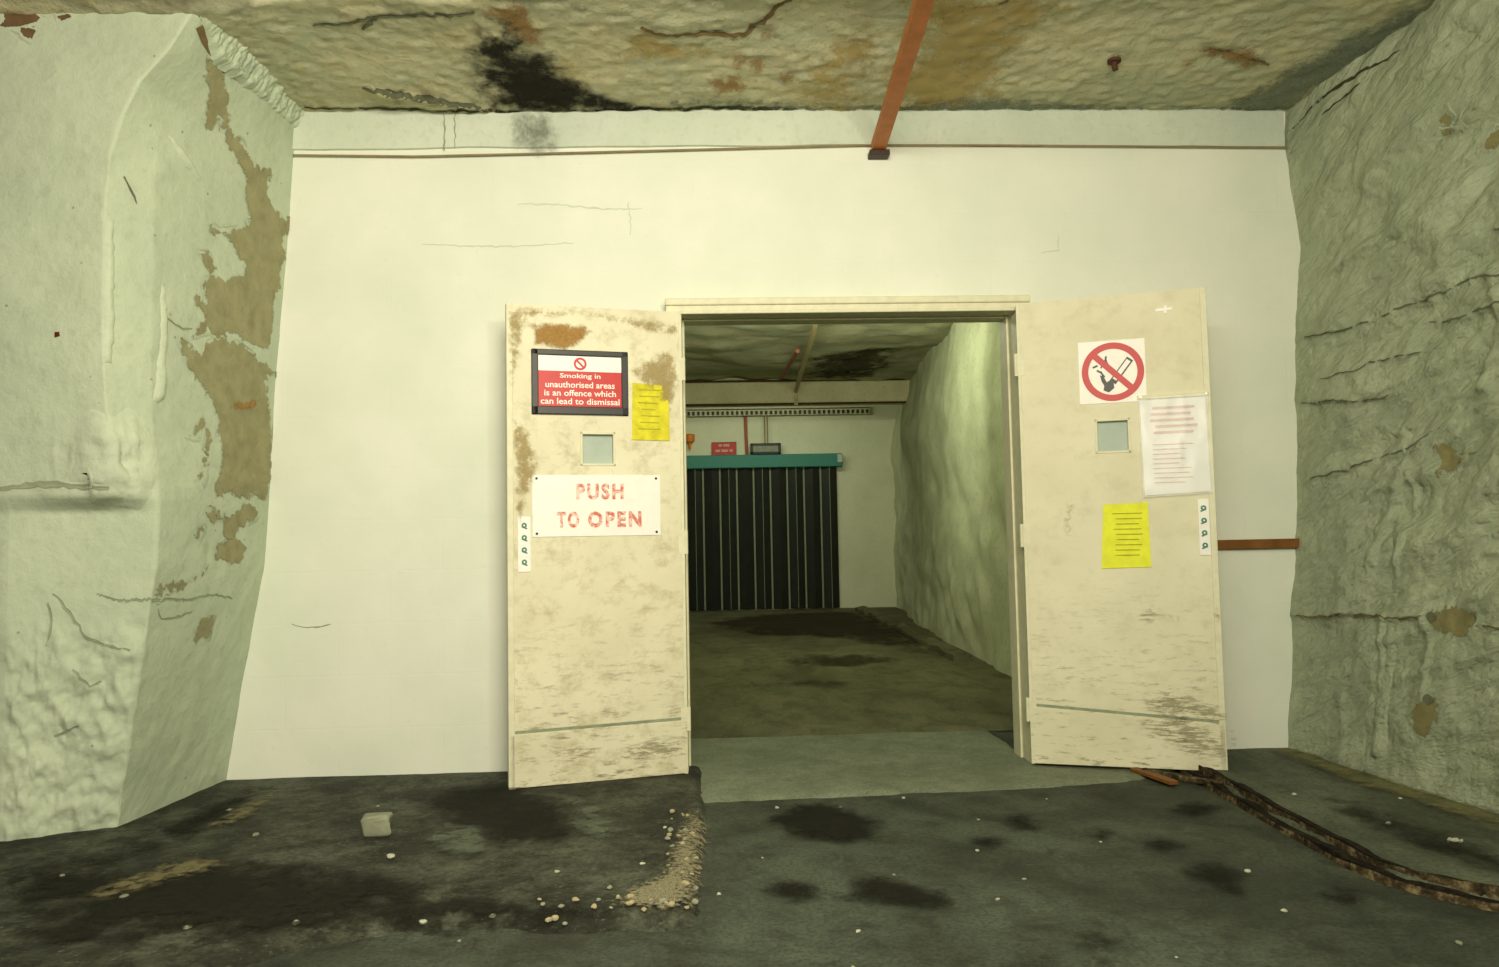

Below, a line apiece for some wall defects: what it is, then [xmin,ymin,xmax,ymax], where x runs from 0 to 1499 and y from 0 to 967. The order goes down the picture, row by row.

crack [640,0,792,38]
crack [1292,49,1401,129]
peeling [155,55,290,605]
crack [1301,273,1499,405]
crack [1310,427,1440,479]
peeling [1433,443,1480,480]
peeling [194,614,216,643]
peeling [1426,604,1475,644]
peeling [1411,694,1439,741]
damp [431,785,572,852]
damp [94,859,220,897]